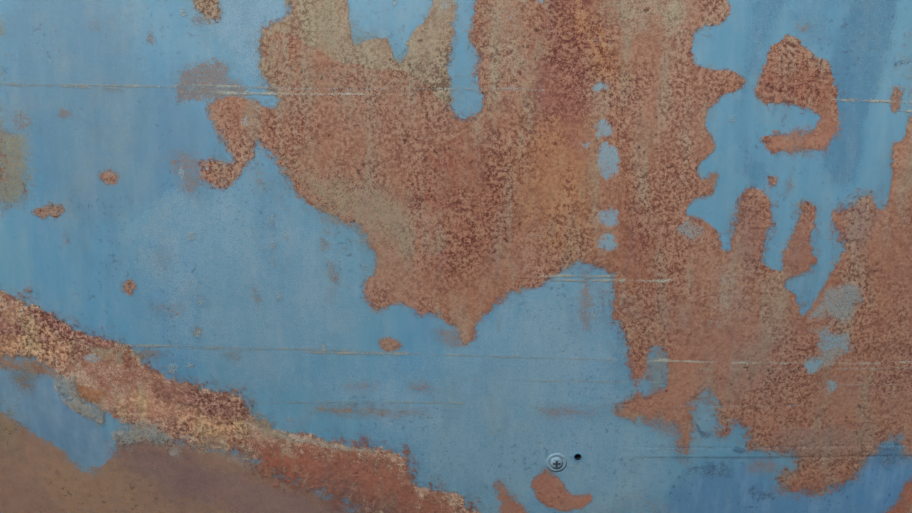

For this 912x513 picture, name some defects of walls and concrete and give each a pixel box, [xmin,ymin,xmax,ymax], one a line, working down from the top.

rust [158,0,224,29]
rust [0,106,65,220]
rust [96,169,121,186]
rust [168,0,912,502]
rust [119,274,137,296]
rust [0,281,532,513]
rust [530,467,594,512]
rust [880,476,912,513]